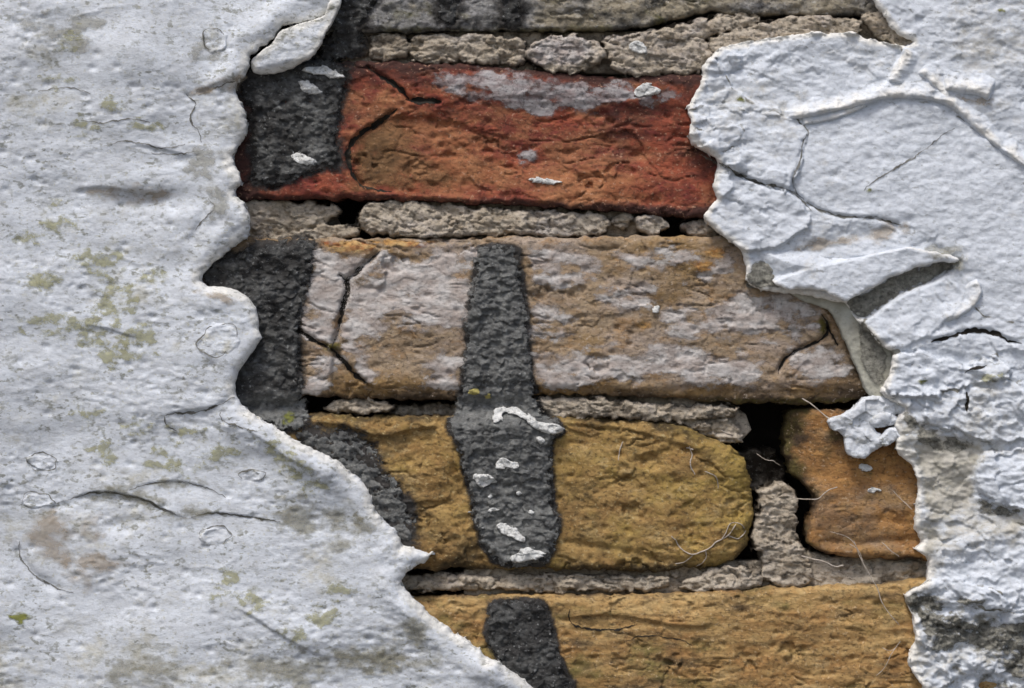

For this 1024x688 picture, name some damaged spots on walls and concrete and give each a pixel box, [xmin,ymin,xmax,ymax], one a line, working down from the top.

peeling [528,177,562,185]
crack [701,134,901,225]
crack [865,128,955,189]
flaking render [0,0,533,688]
crack [296,251,380,383]
crack [778,314,838,374]
flaking render [685,0,1024,688]
crack [931,327,1022,344]
crack [57,481,280,522]
crack [18,541,73,593]